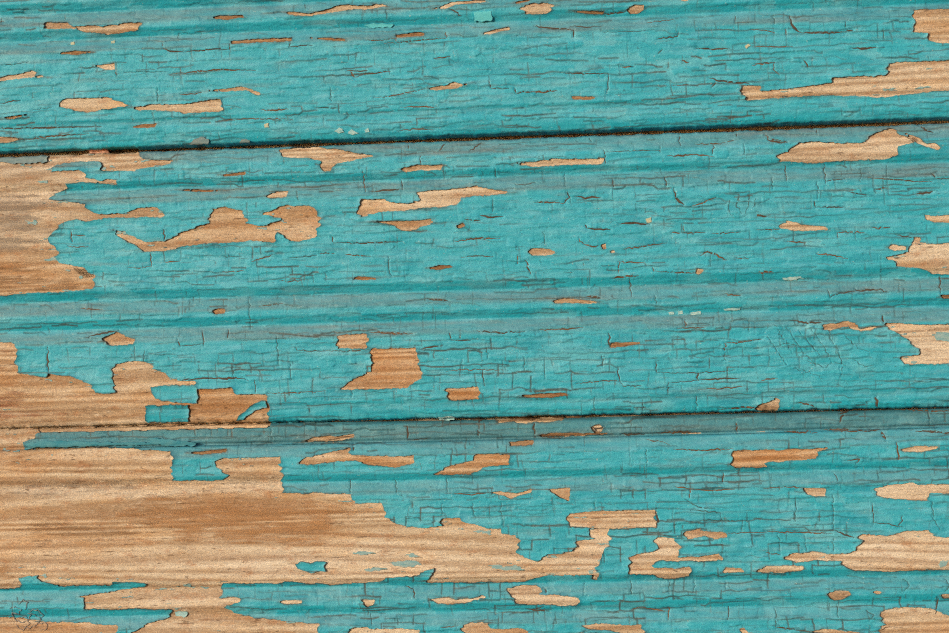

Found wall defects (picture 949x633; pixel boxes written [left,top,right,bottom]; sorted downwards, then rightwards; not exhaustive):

crack [82,43,256,102]
crack [710,15,884,88]
peeling [740,60,949,100]
crack [495,130,745,206]
peeling [776,128,940,163]
peeling [0,150,173,296]
peeling [113,191,321,251]
crack [579,214,912,297]
crack [175,327,583,394]
crack [508,321,777,463]
peeling [0,342,744,633]
peeling [756,530,949,573]